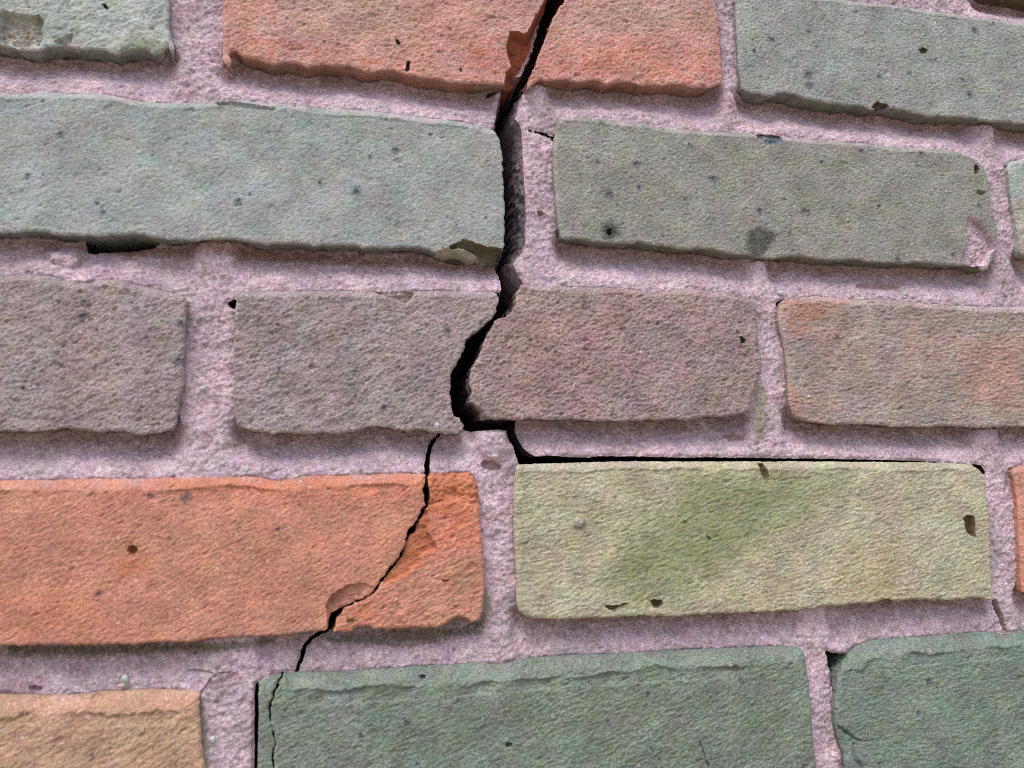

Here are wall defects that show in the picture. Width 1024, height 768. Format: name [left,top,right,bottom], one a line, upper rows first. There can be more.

spalling [435,239,502,268]
spalling [963,216,996,267]
crack [184,0,942,768]